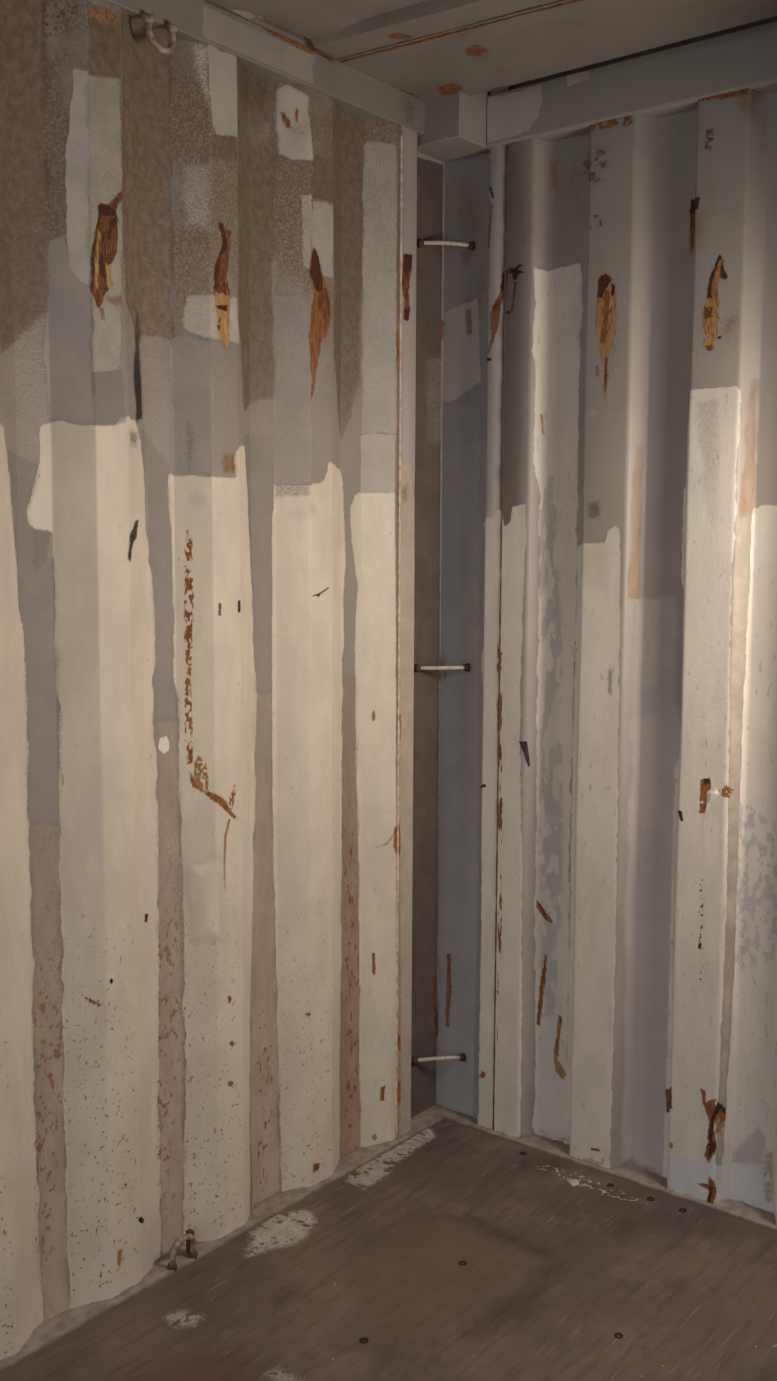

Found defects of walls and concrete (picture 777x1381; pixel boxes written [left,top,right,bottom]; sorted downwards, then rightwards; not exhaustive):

corrosion [90,191,123,320]
corrosion [213,222,232,347]
corrosion [308,247,332,399]
corrosion [487,264,525,361]
corrosion [595,273,623,397]
corrosion [686,197,741,350]
corrosion [380,237,447,1135]
corrosion [699,778,734,833]
corrosion [27,530,377,1323]
corrosion [536,899,553,923]
corrosion [536,954,566,1079]
corrosion [697,1089,726,1204]